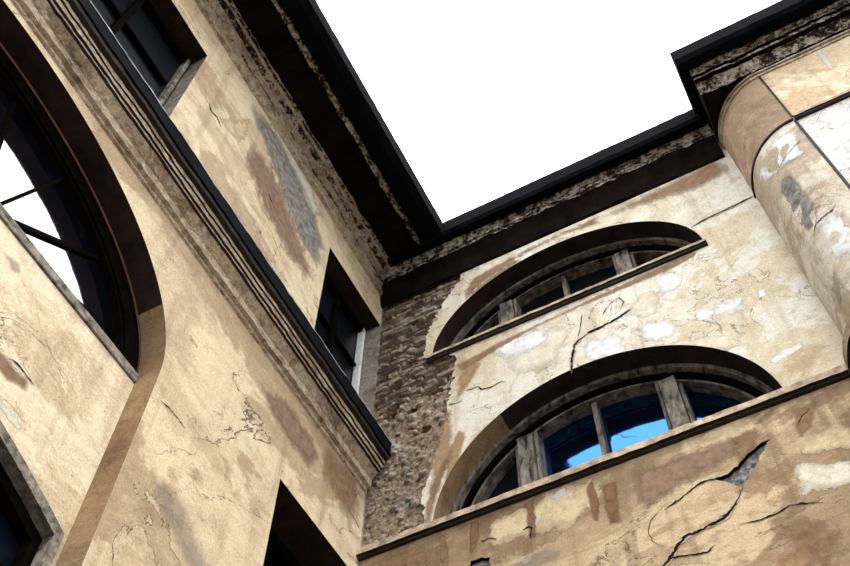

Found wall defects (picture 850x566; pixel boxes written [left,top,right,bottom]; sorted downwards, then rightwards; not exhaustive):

peeling [760,132,803,182]
peeling [821,214,850,260]
crack [569,297,631,373]
water stain [0,352,27,388]
flaking render [362,274,461,547]
flaking render [715,439,770,486]
peeling [795,424,850,495]
peeling [488,478,603,546]
crack [648,477,823,566]
flaking render [470,557,490,566]